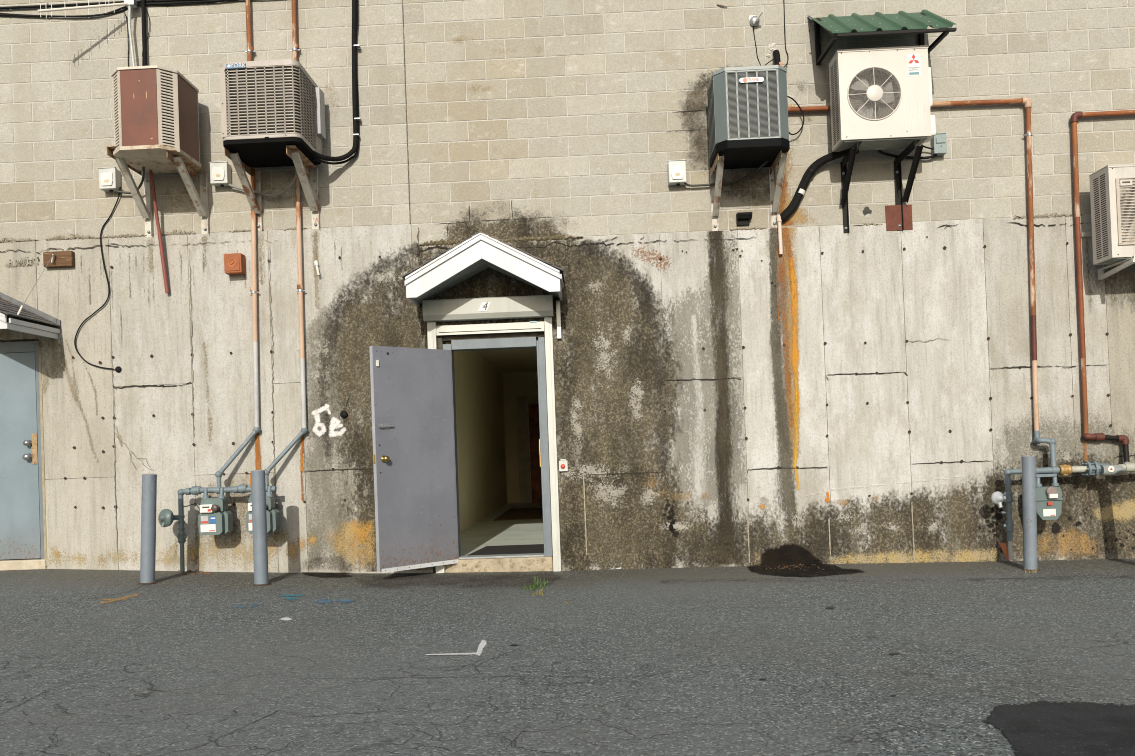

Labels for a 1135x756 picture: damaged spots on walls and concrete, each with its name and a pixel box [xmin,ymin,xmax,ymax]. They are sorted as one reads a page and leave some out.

damp [157,480,253,568]
damp [269,213,1135,588]
corrosion [777,151,805,490]